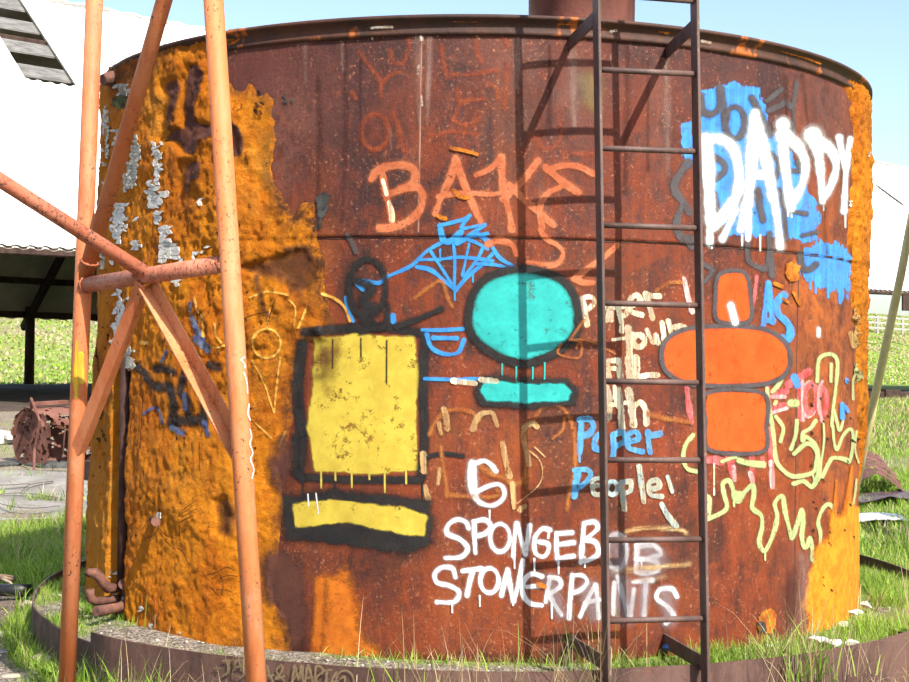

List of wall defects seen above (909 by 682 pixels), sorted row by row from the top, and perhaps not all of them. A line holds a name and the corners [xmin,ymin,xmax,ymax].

peeling [100,106,119,166]
peeling [109,65,212,264]
peeling [108,288,129,343]
rust [801,465,860,635]
rust [312,570,382,658]